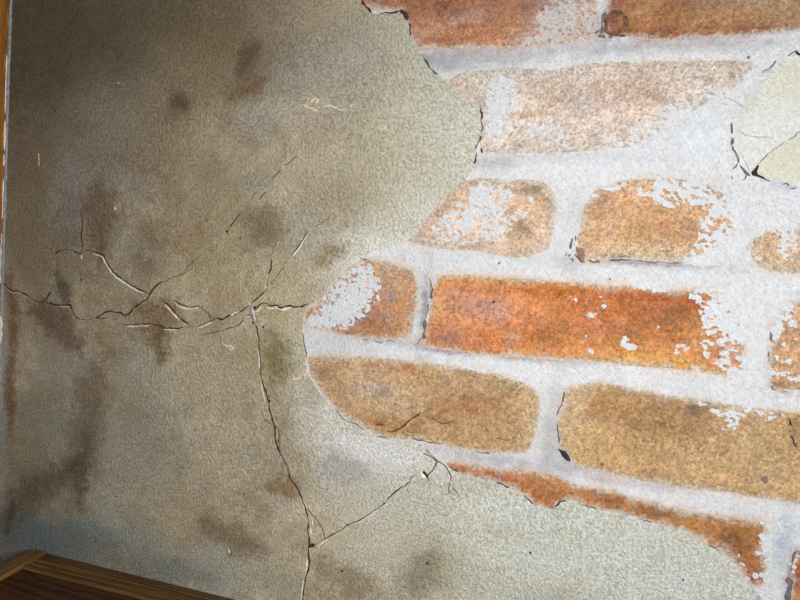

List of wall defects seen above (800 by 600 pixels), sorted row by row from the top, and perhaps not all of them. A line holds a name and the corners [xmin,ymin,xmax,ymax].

crack [762,50,800,73]
crack [731,123,800,180]
crack [229,155,297,228]
spalling [303,0,800,600]
crack [3,212,460,600]